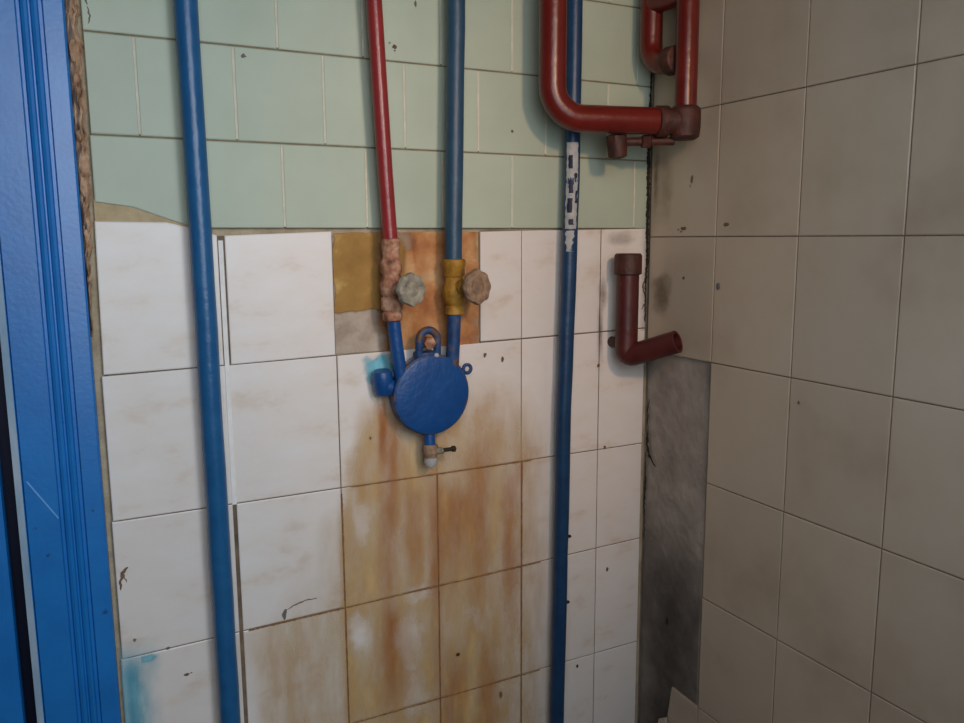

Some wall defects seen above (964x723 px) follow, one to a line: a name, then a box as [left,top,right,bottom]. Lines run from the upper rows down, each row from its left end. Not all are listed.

spalling [80,177,189,244]
corrosion [400,232,447,349]
corrosion [460,299,479,345]
corrosion [462,232,479,279]
corrosion [249,408,540,723]
spalling [639,355,712,723]